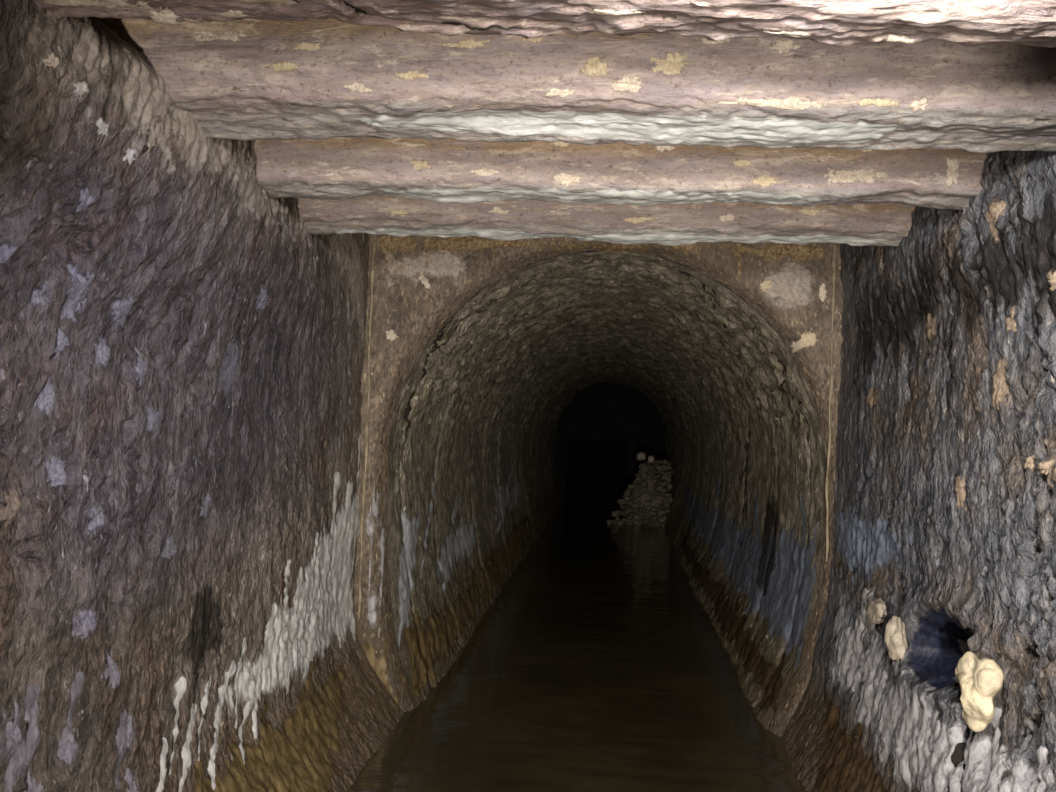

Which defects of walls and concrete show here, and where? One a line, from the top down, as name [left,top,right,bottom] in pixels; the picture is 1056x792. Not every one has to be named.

crack [340,0,370,15]
crack [441,22,523,31]
water stain [71,610,97,639]
water stain [156,432,535,792]
water stain [101,648,121,689]
water stain [0,685,43,792]
water stain [56,672,85,771]
water stain [115,707,139,792]